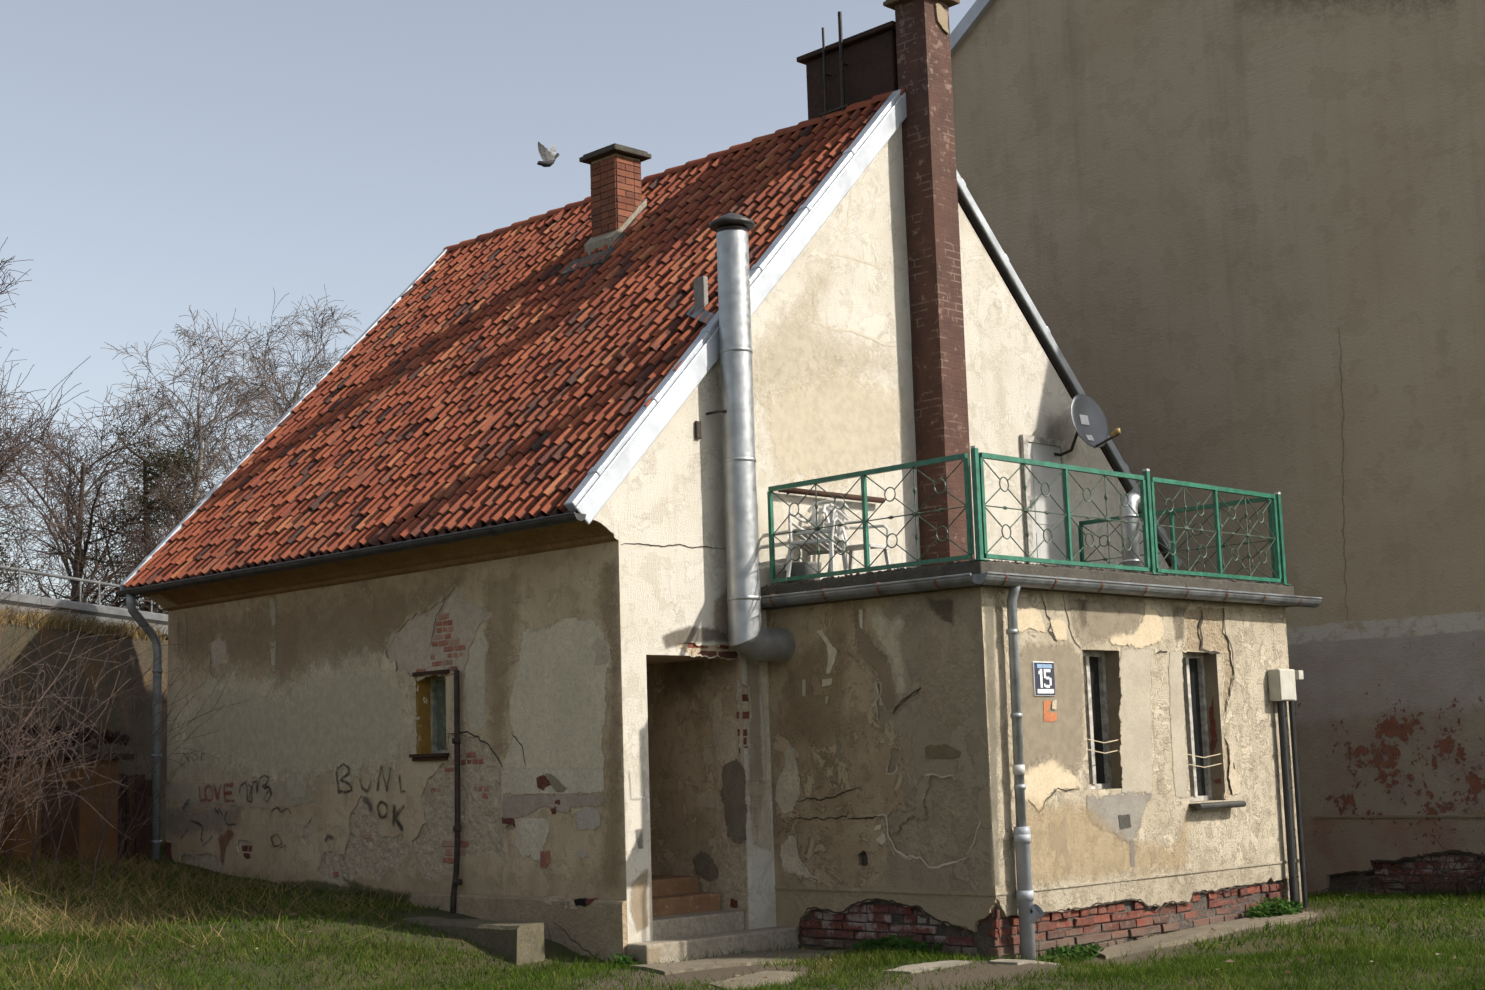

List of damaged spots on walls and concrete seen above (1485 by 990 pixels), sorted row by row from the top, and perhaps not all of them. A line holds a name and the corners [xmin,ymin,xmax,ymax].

flaking render [1017,606,1067,641]
flaking render [316,587,613,886]
flaking render [711,685,752,767]
flaking render [716,794,749,913]
flaking render [775,744,824,883]
crack [796,787,877,820]
flaking render [925,744,961,760]
flaking render [1043,700,1057,722]
peeling [1024,754,1080,872]
flaking render [1107,604,1241,799]
flaking render [1313,684,1485,895]
flaking render [797,880,1287,960]